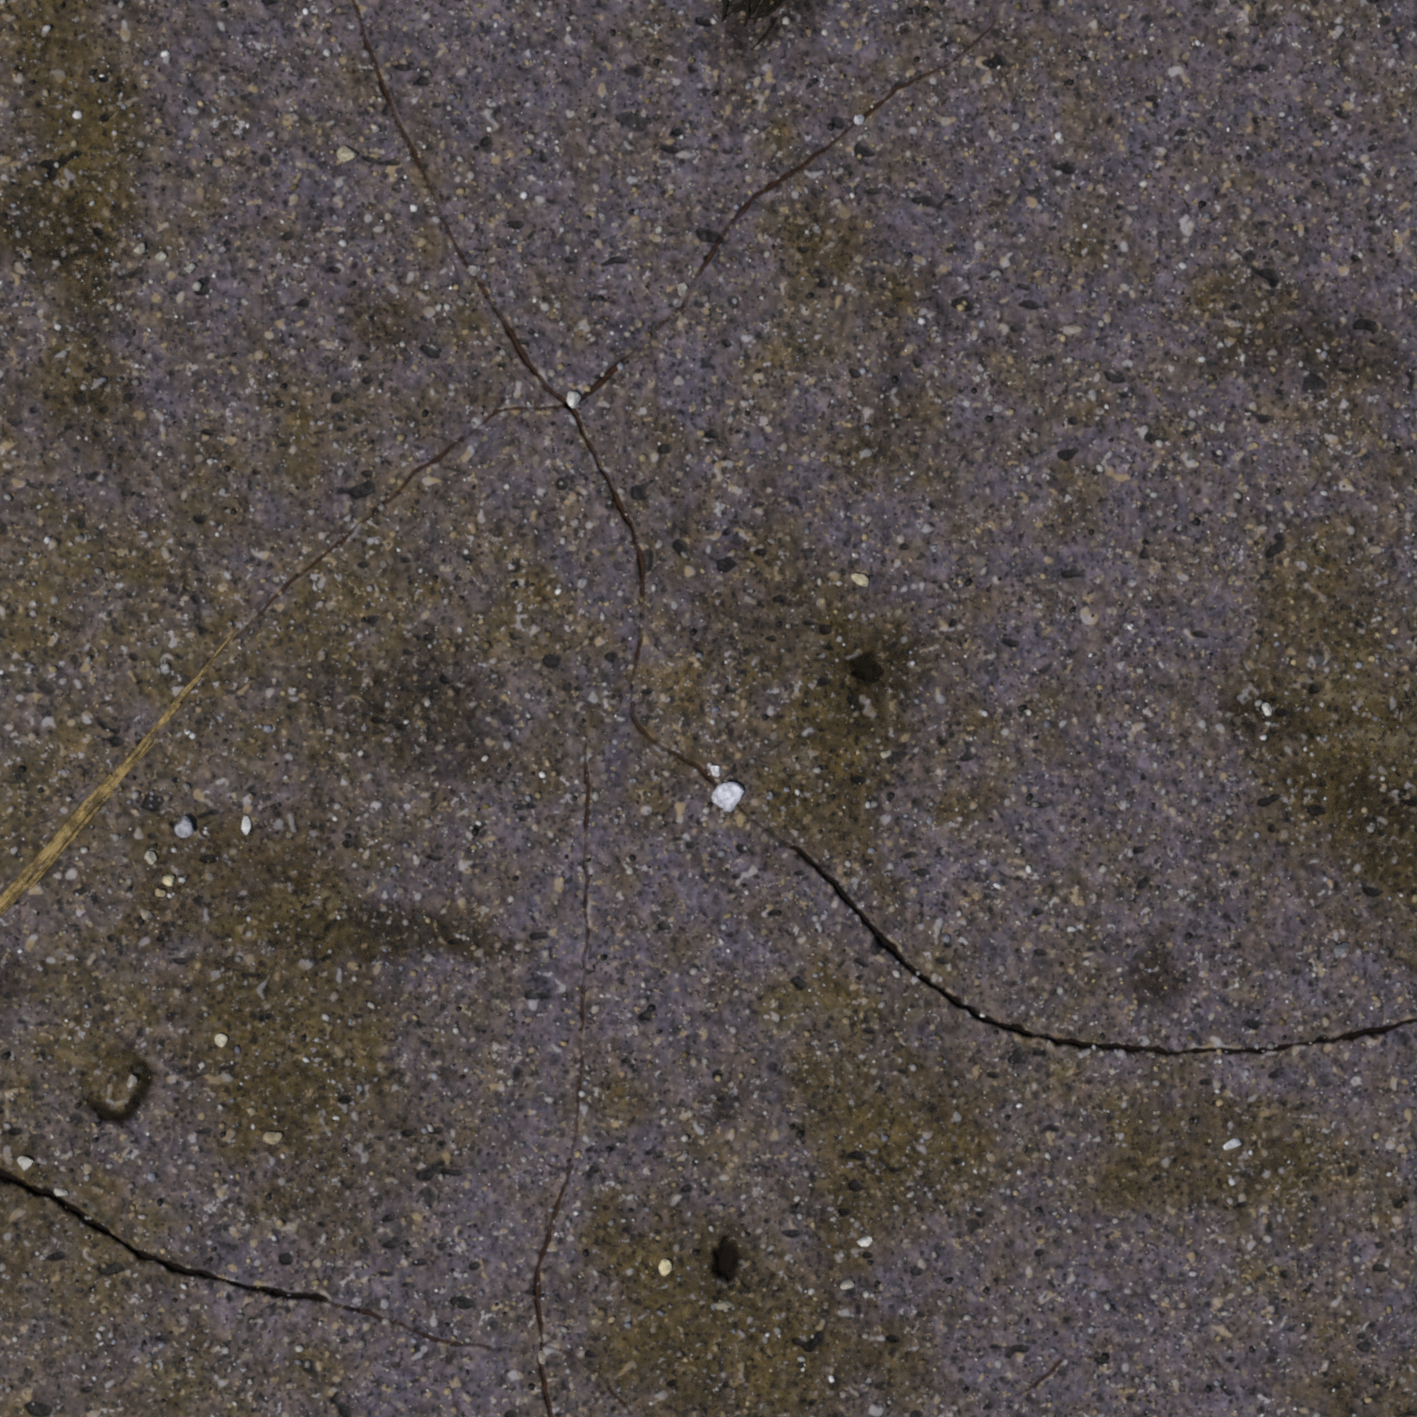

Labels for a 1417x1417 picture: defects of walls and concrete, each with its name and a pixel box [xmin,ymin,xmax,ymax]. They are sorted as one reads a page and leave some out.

crack [352,0,431,188]
crack [699,27,991,273]
crack [233,527,356,640]
crack [389,221,1417,1056]
crack [0,1169,490,1348]